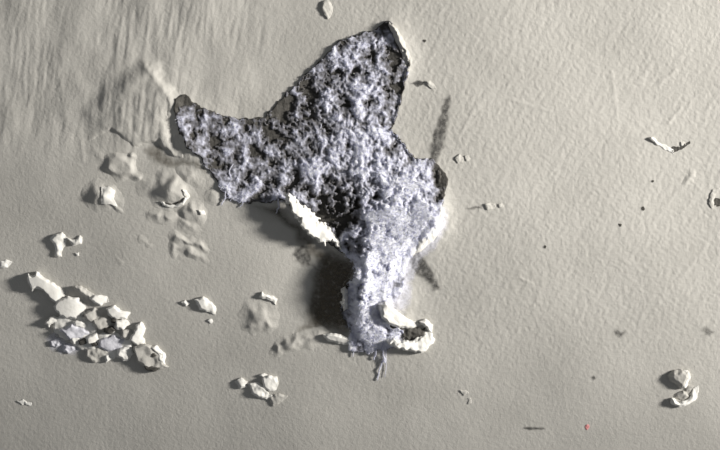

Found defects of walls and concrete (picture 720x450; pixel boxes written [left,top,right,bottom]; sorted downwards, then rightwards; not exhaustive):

peeling [649,137,690,153]
peeling [174,21,448,345]
peeling [50,232,82,257]
peeling [27,271,169,372]
peeling [378,301,435,353]
peeling [235,373,287,406]
peeling [667,369,699,407]